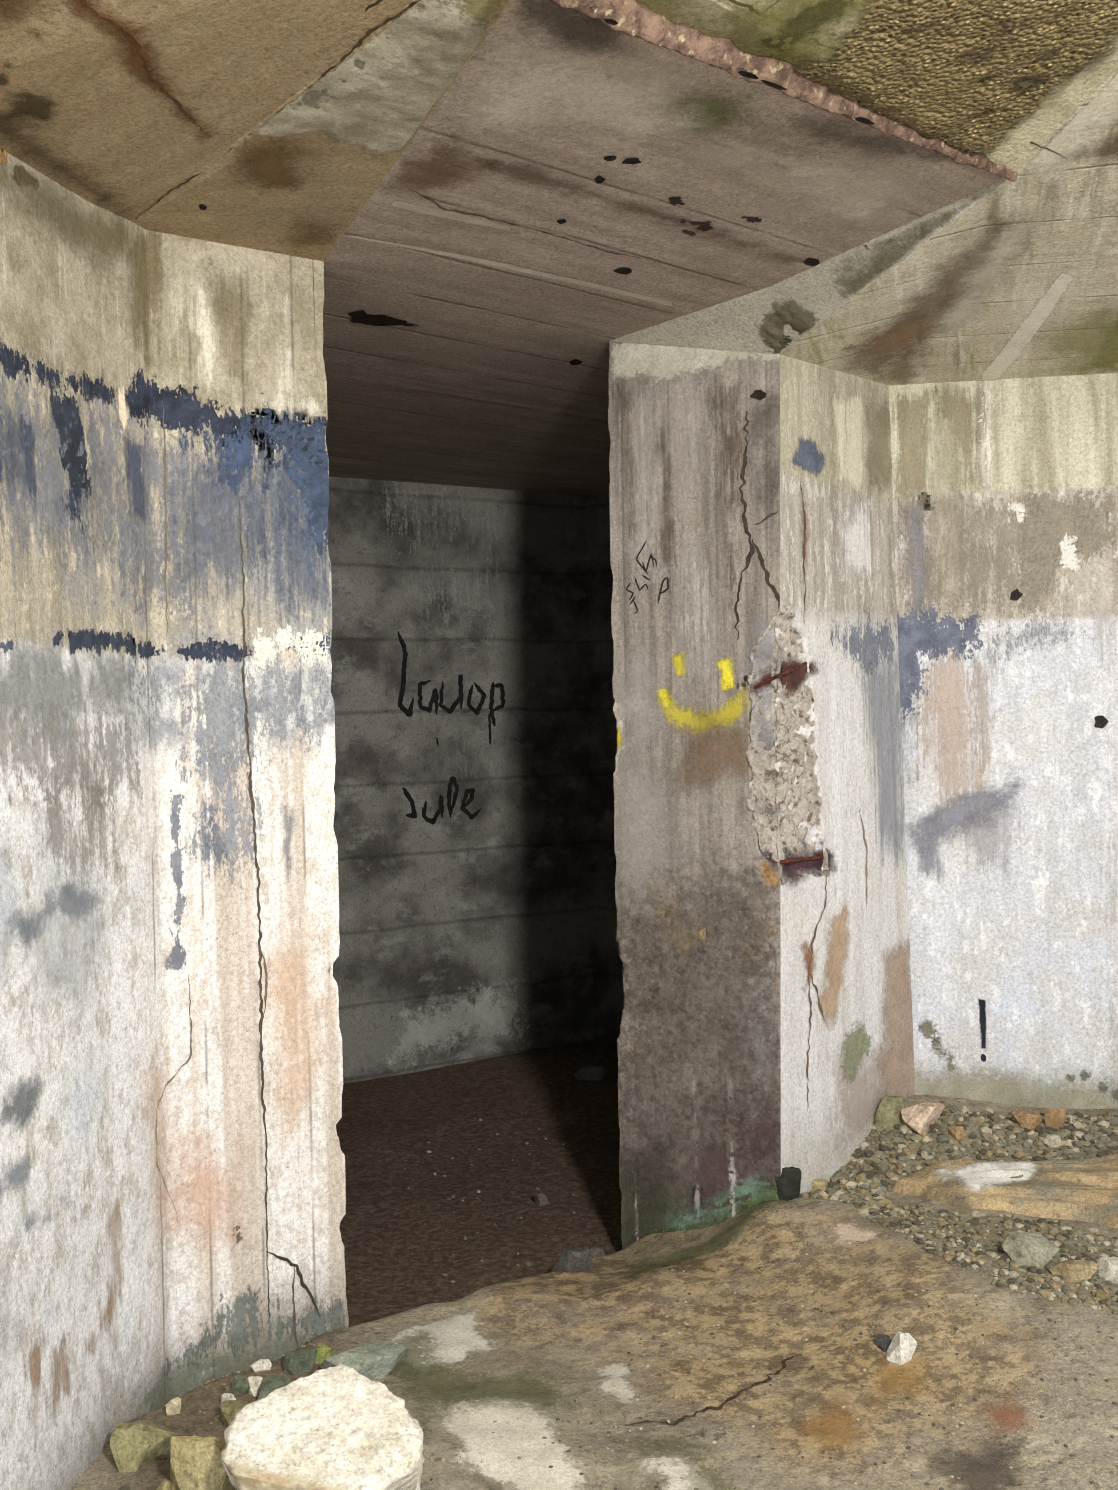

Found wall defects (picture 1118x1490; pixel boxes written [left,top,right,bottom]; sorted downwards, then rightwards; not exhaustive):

rust [71,0,211,138]
crack [135,0,420,220]
crack [729,0,779,12]
leakage [940,223,1035,328]
crack [734,411,780,640]
rust [751,658,818,692]
spalling [746,603,831,885]
crack [238,497,321,1347]
rust [762,847,837,885]
leakage [626,1073,781,1242]
crack [624,1354,802,1425]